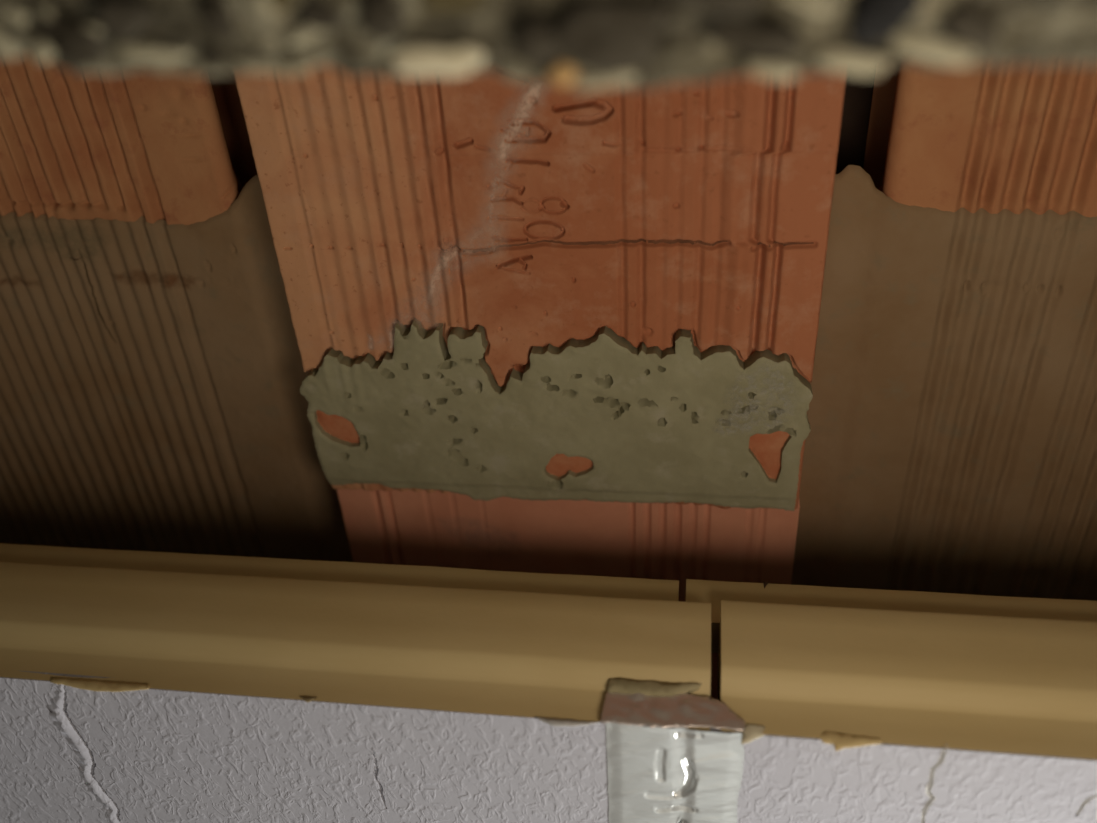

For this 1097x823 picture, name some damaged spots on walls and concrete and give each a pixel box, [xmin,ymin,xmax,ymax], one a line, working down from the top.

water stain [491,84,541,201]
spalling [316,410,360,443]
spalling [546,454,593,477]
spalling [749,431,790,479]
crack [45,684,121,823]
crack [921,744,949,823]
crack [1075,795,1097,816]